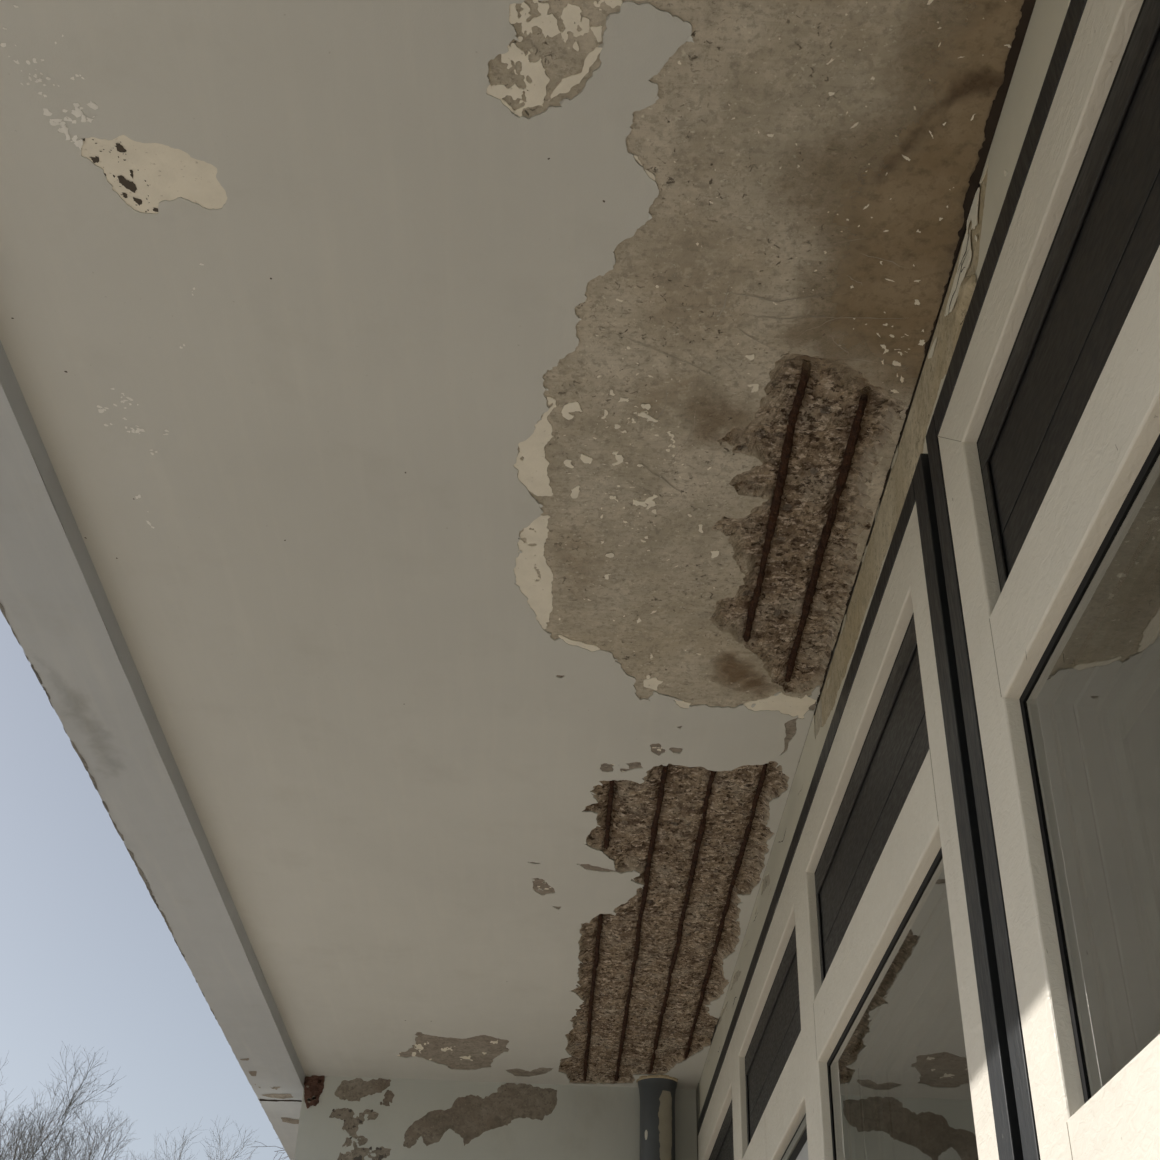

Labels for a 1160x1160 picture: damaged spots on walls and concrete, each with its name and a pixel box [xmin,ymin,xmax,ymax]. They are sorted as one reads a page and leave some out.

peeling [80,135,227,214]
peeling [486,0,988,1084]
peeling [397,1032,509,1070]
peeling [304,1075,557,1160]